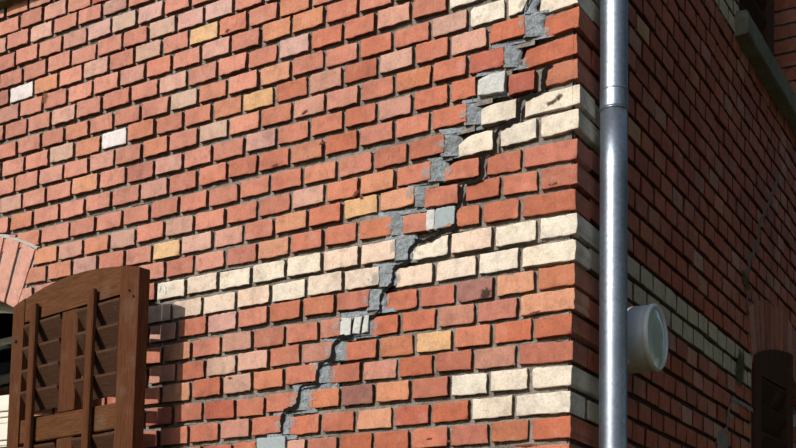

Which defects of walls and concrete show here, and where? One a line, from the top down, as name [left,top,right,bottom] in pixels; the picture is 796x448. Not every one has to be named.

crack [257,0,556,448]